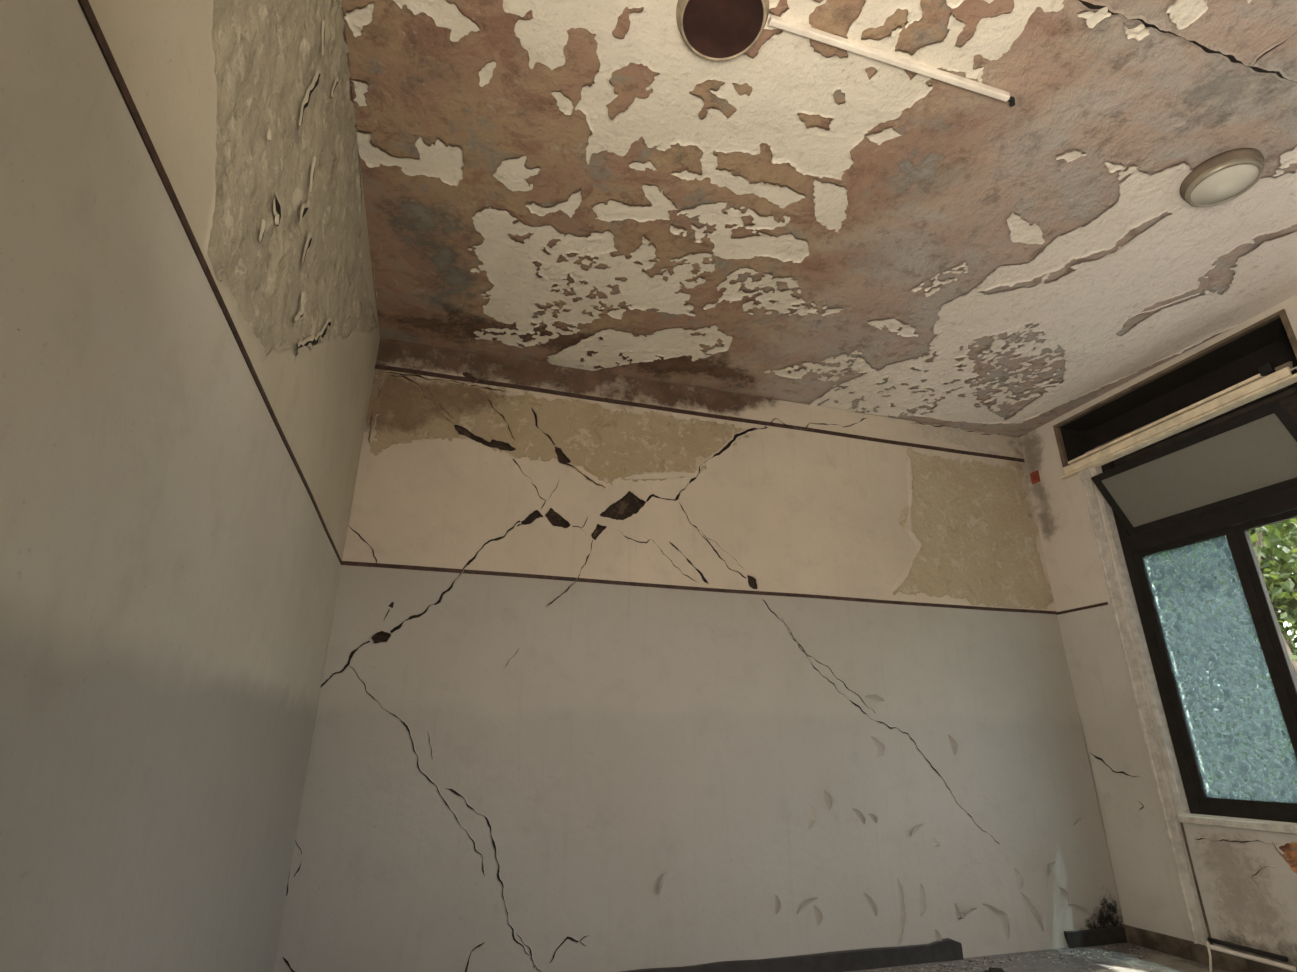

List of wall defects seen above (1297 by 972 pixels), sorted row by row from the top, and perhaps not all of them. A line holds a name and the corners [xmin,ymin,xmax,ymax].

crack [1073,0,1297,86]
crack [259,157,331,352]
water stain [366,200,776,430]
peeling [207,0,1297,610]
crack [320,371,606,972]
crack [545,417,1009,845]
flaking render [1278,842,1297,873]